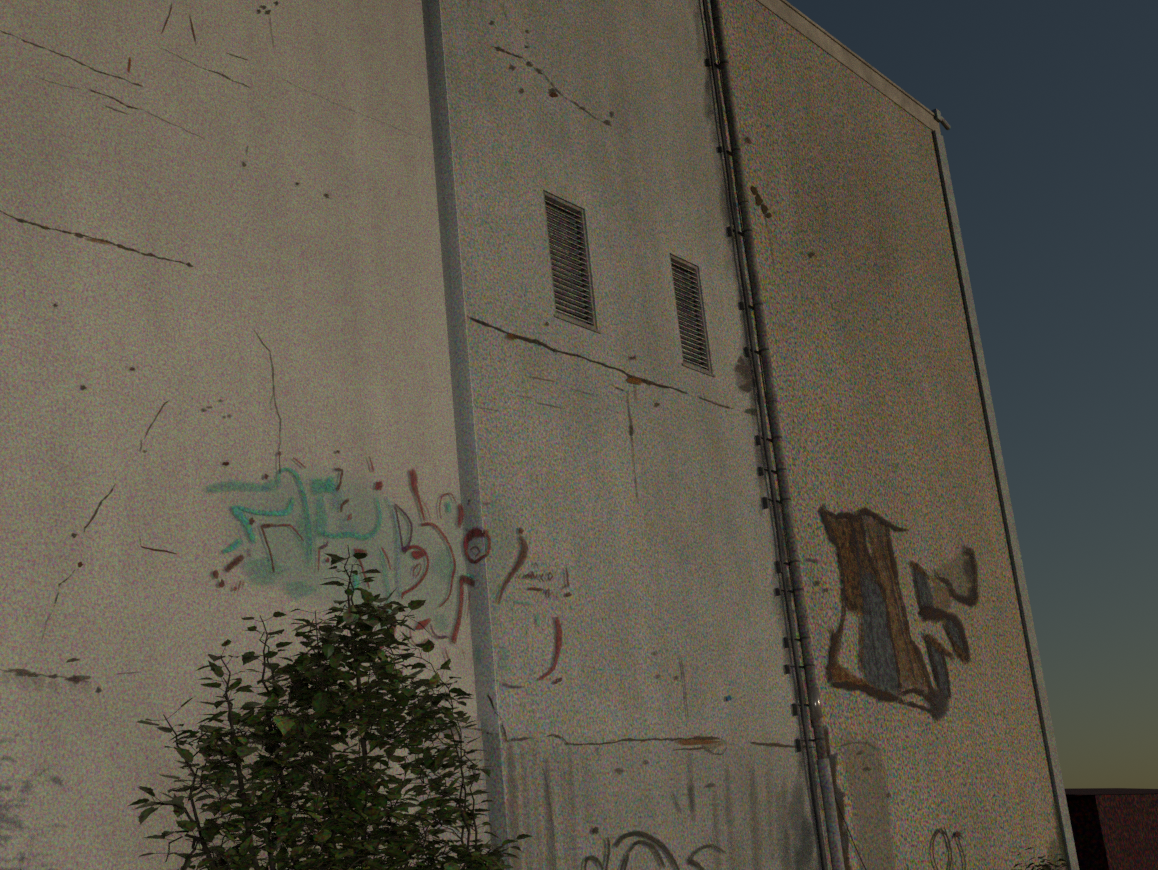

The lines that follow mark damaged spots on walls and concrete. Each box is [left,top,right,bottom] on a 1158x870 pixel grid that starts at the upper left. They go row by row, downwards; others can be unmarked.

crack [2,31,142,114]
crack [490,20,614,126]
crack [0,210,193,267]
crack [254,330,281,452]
crack [470,317,733,498]
crack [487,658,813,755]